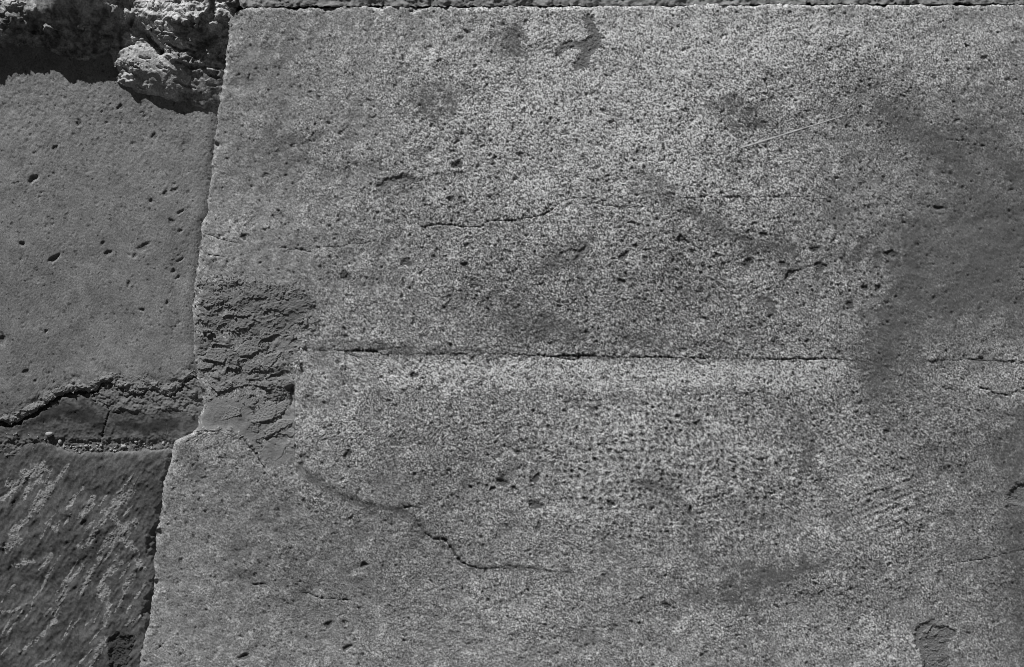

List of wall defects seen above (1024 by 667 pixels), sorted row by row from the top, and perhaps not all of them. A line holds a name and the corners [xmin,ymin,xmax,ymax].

crack [415,196,640,228]
spalling [0,273,323,463]
crack [401,505,556,610]